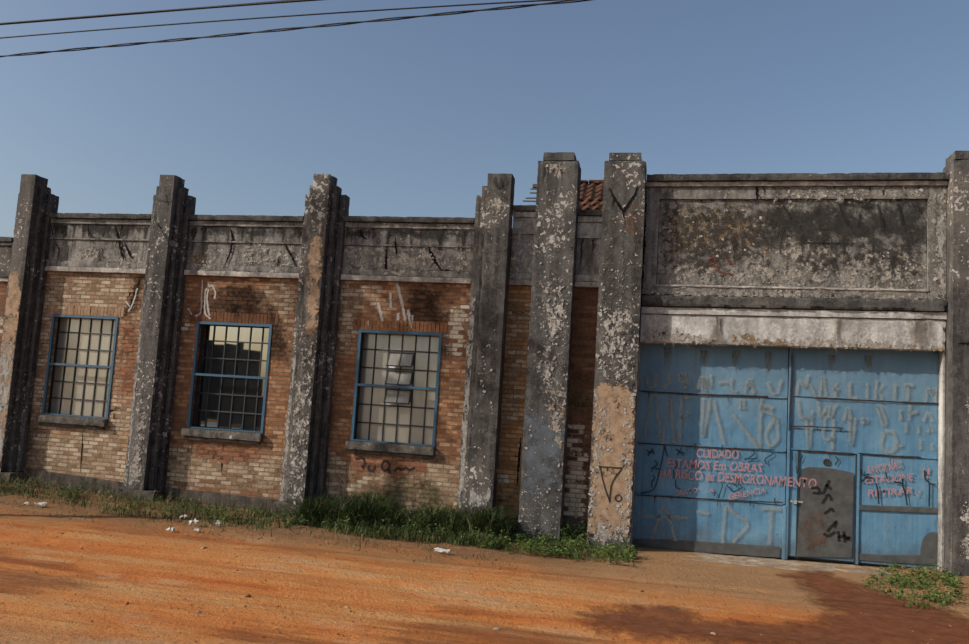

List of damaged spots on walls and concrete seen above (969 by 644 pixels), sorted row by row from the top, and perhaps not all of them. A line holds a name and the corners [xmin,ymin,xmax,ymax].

crack [114,226,140,315]
crack [225,229,236,265]
damp [256,283,294,344]
crack [428,247,451,271]
mould [657,199,927,300]
spalling [0,271,21,471]
spalling [280,236,323,505]
spalling [441,298,510,508]
peeling [519,191,572,539]
spalling [587,186,946,545]
peeling [960,502,969,559]